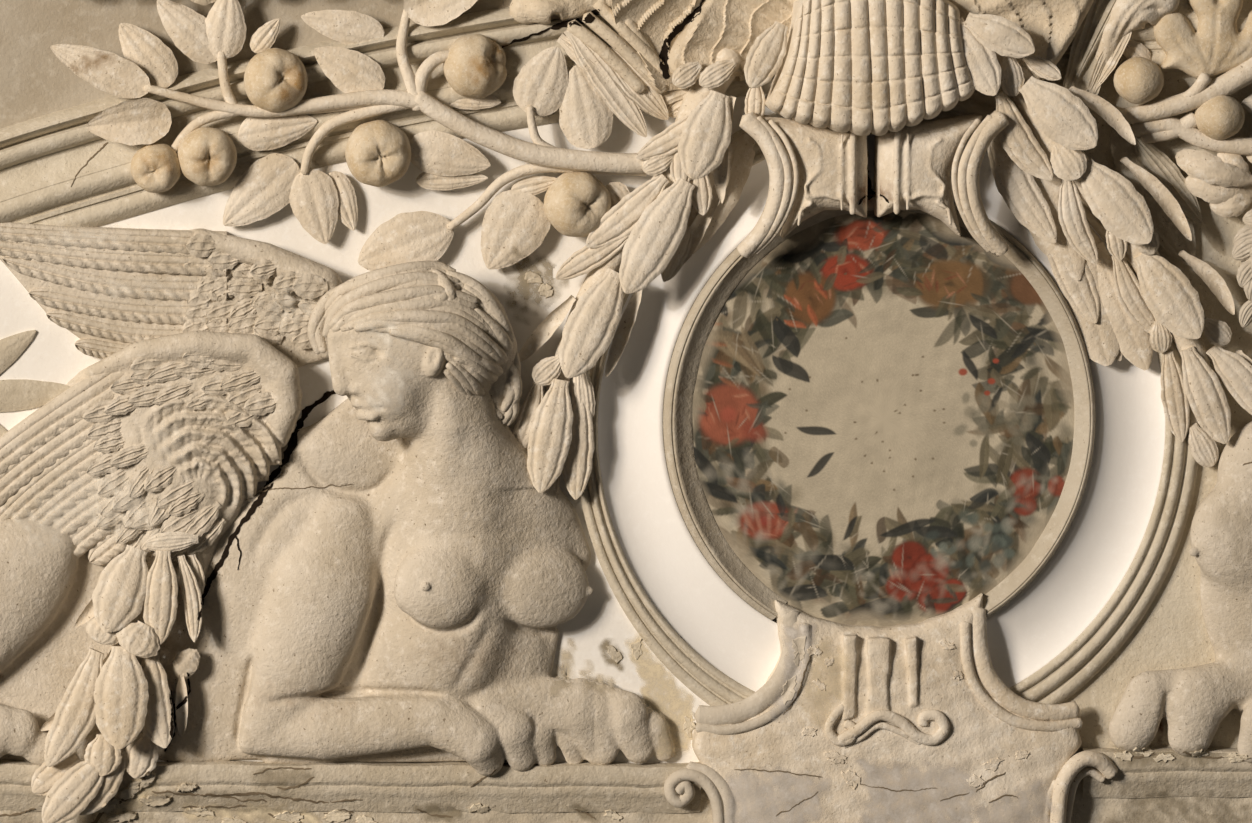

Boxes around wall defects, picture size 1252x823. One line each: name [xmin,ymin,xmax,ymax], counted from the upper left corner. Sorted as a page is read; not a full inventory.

crack [659,0,705,79]
crack [197,390,351,620]